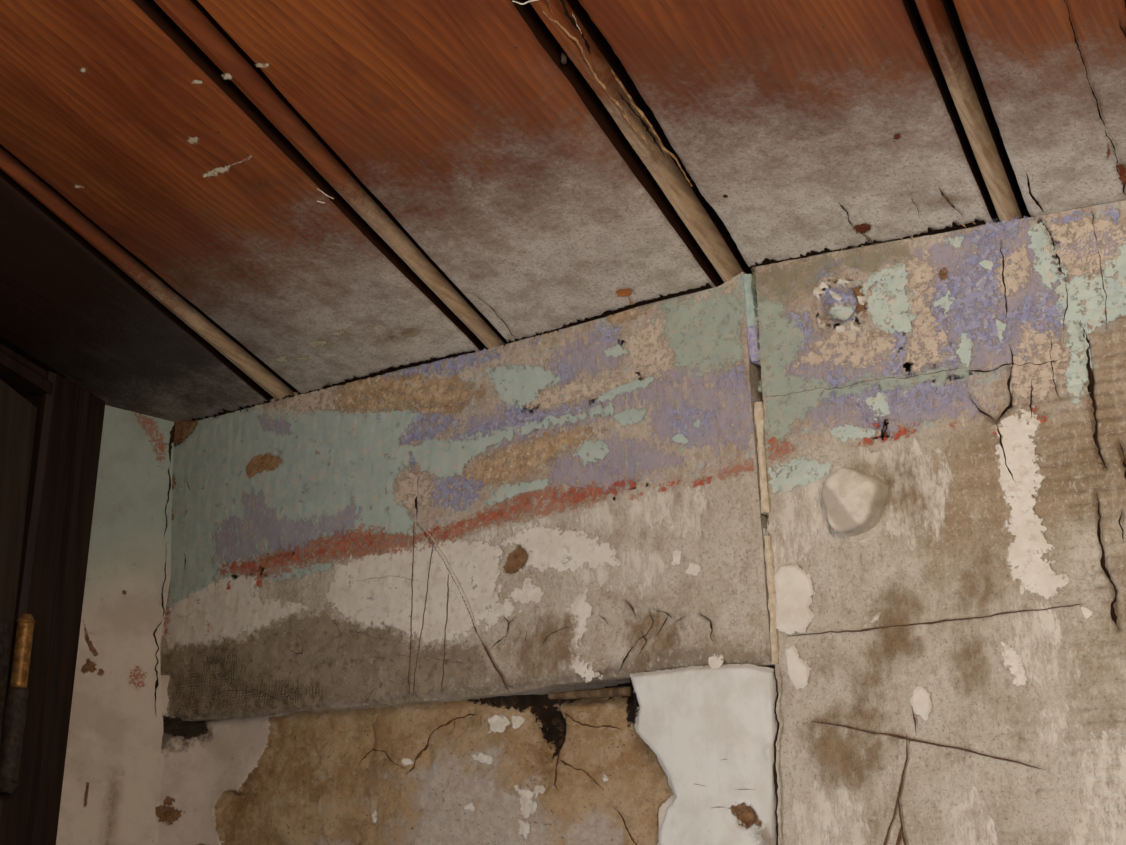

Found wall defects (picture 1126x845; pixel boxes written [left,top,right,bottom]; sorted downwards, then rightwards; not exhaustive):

crack [1064,0,1126,195]
crack [477,283,713,349]
crack [153,351,476,716]
peeling [132,208,1126,845]
crack [675,174,1126,845]
water stain [161,611,486,721]
crack [492,617,573,647]
crack [619,602,713,671]
crack [359,713,479,774]
crack [554,713,637,845]